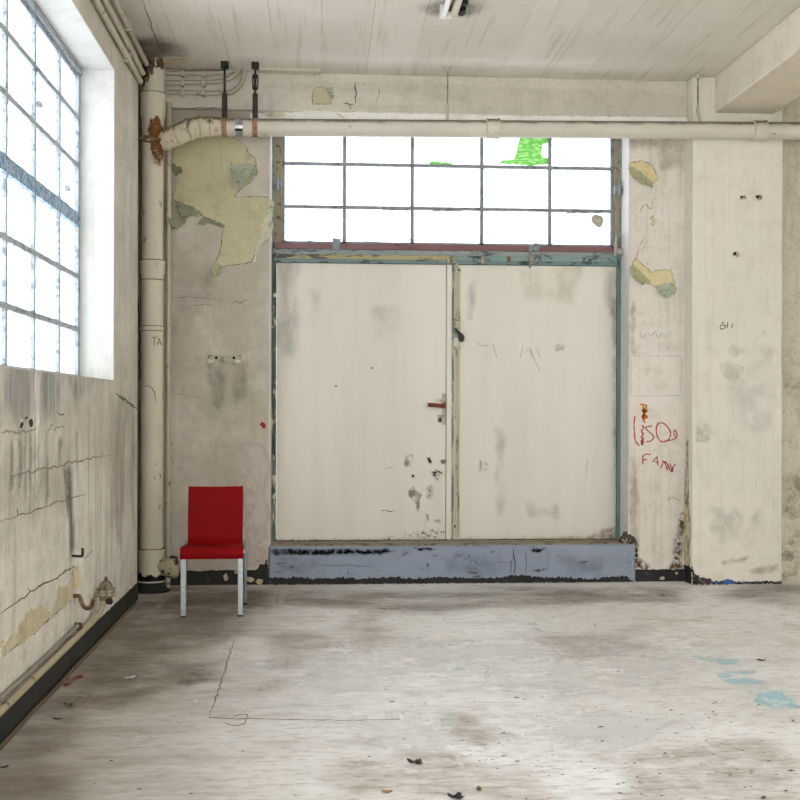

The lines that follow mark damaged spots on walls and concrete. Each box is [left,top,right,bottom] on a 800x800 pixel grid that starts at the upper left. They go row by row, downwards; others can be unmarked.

peeling [250,86,687,121]
rust [148,116,164,165]
peeling [628,160,658,188]
peeling [166,136,274,276]
peeling [630,259,677,299]
crack [11,455,110,477]
crack [0,494,85,522]
crack [0,551,92,614]
peeling [0,563,83,659]
crack [209,640,400,726]